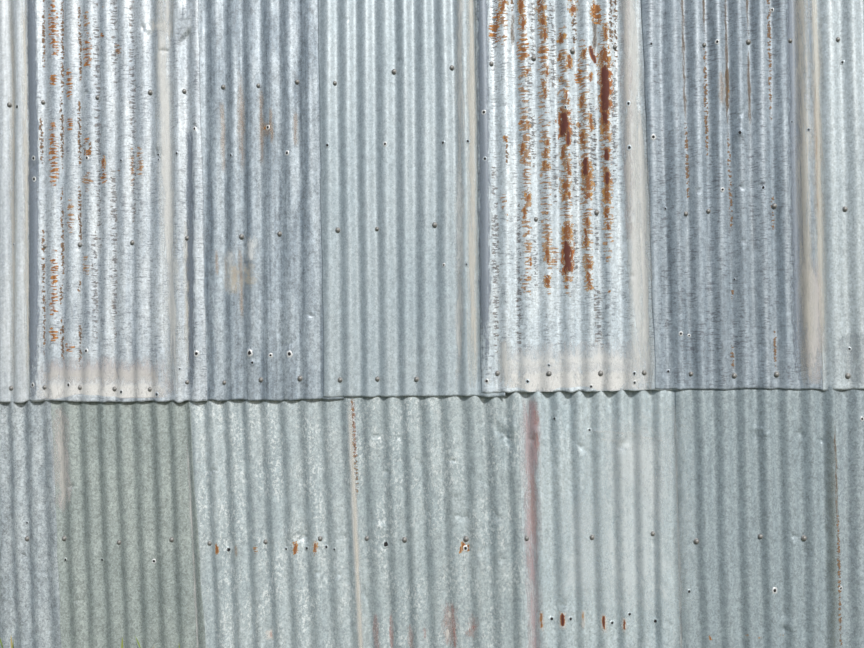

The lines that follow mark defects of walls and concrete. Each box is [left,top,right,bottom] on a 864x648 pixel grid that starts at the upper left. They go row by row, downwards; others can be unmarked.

rust [39,0,107,362]
rust [118,147,144,186]
rust [489,0,618,297]
rust [559,612,567,629]